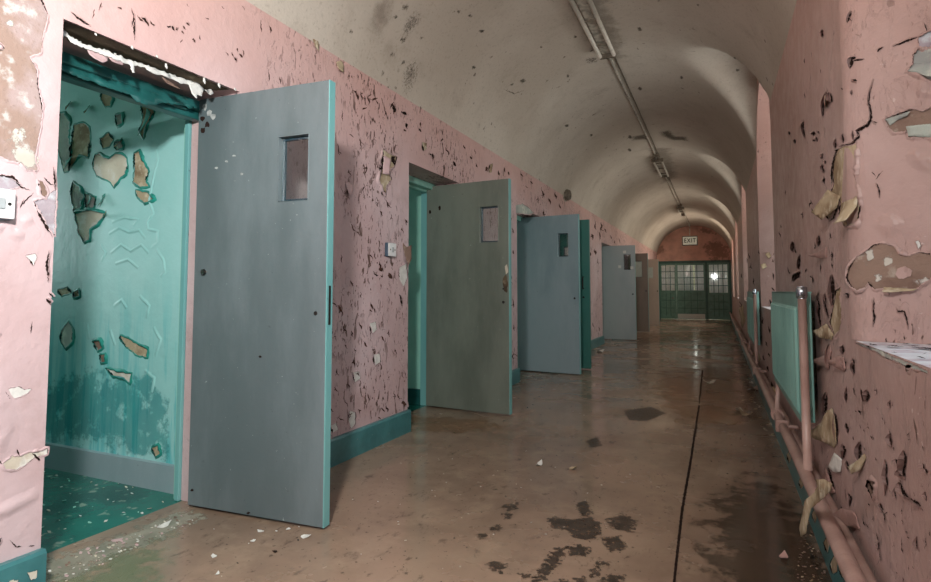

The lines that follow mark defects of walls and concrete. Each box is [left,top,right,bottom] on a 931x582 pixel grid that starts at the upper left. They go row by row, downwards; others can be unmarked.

peeling [87,49,123,65]
peeling [0,0,58,237]
peeling [58,64,216,244]
peeling [811,141,863,230]
crack [788,35,918,219]
peeling [882,106,931,142]
peeling [92,337,133,386]
peeling [119,334,149,359]
peeling [812,239,931,370]
peeling [855,341,929,376]
crack [741,233,931,580]
peeling [0,446,50,473]